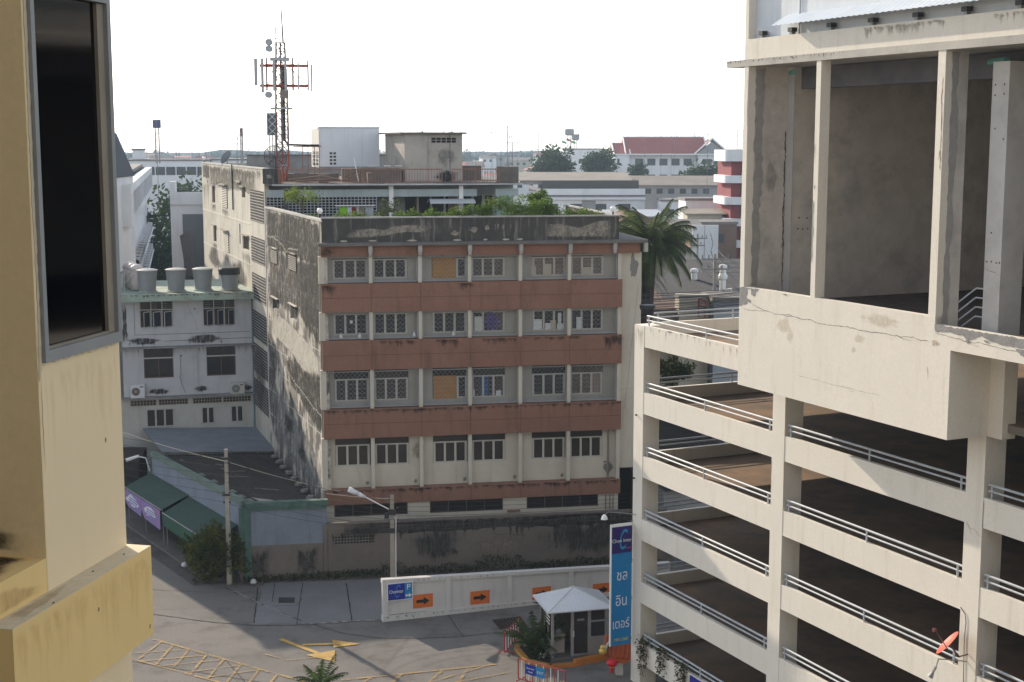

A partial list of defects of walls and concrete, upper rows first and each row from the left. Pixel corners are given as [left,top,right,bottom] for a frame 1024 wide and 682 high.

crack [779,131,787,285]
damp [266,211,331,344]
damp [333,512,633,558]